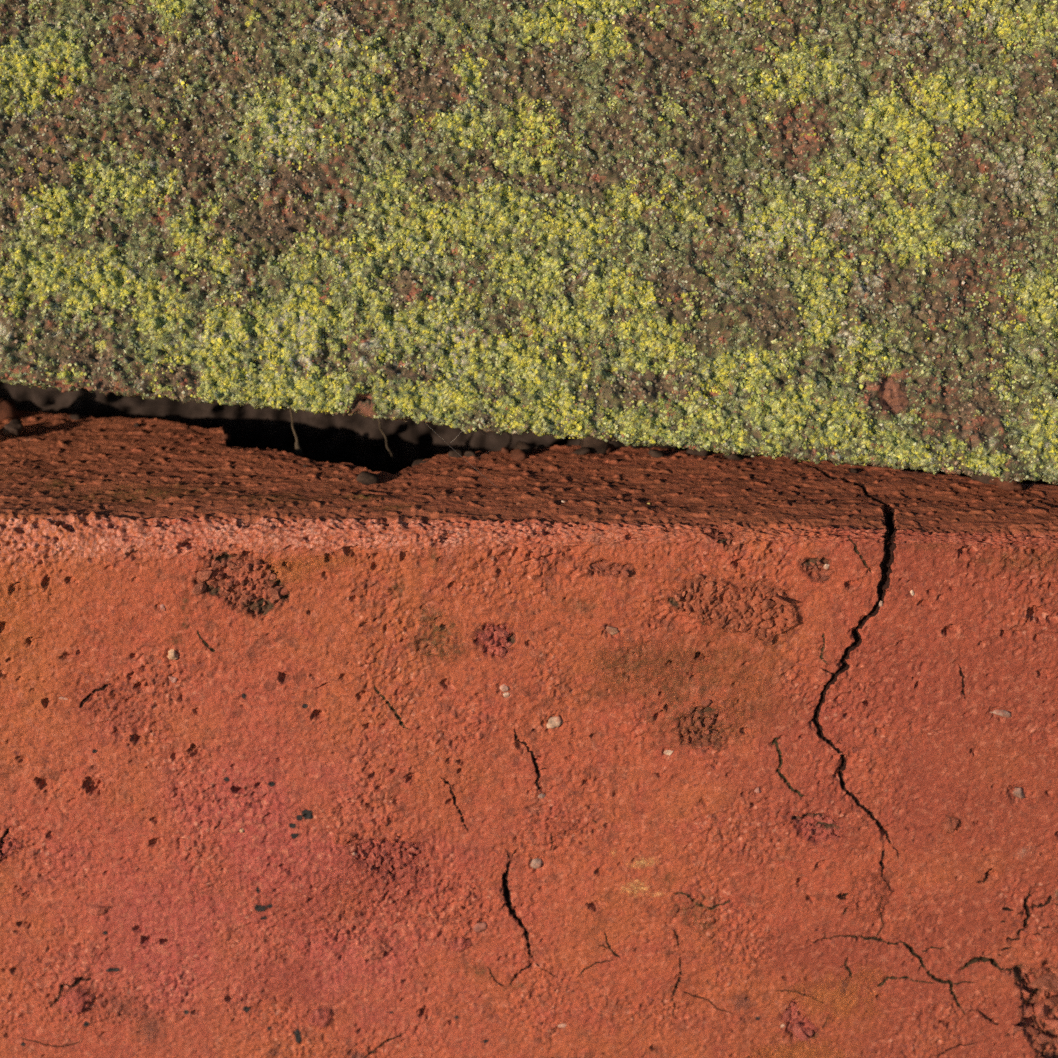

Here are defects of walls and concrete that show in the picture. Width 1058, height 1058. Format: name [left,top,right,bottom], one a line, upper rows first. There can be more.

spalling [192,552,290,618]
crack [514,729,546,790]
crack [772,738,804,797]
crack [803,463,1058,1025]
crack [488,850,619,987]
crack [775,990,829,1028]
spalling [1001,958,1058,1058]
crack [937,1043,974,1058]